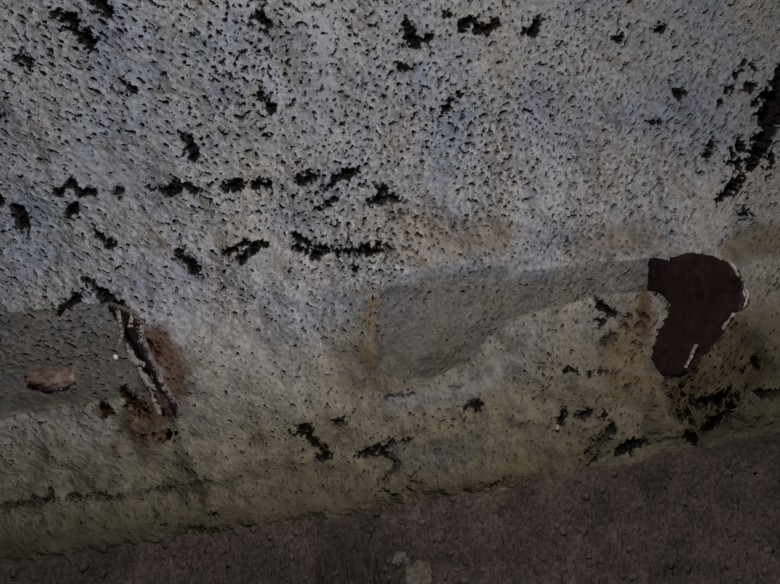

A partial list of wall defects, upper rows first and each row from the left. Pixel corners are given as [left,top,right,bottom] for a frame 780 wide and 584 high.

corrosion [115,309,191,445]